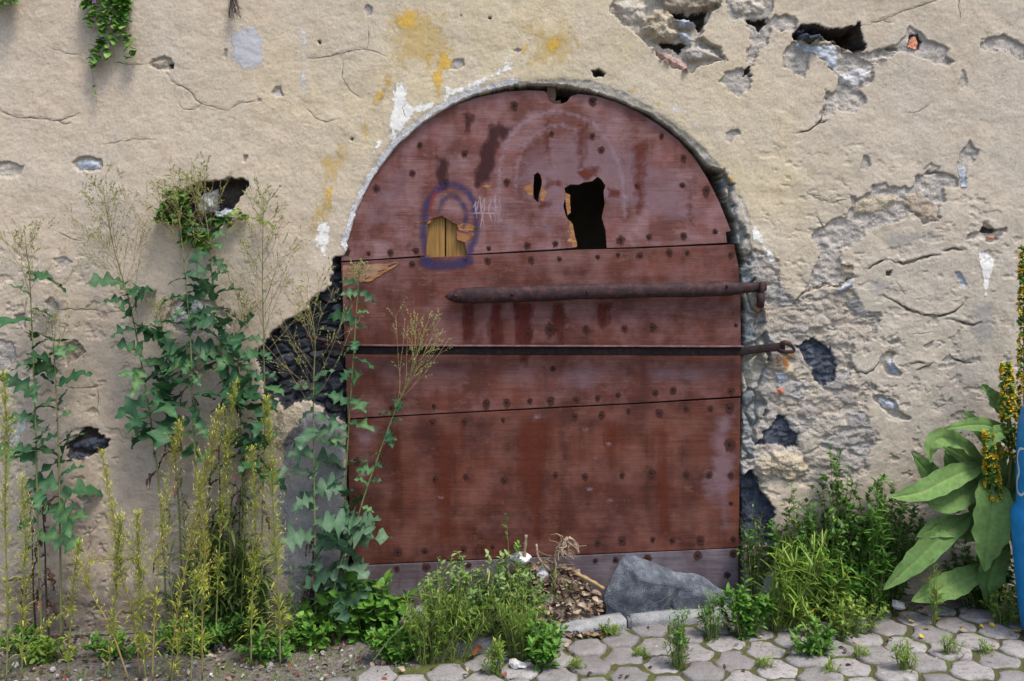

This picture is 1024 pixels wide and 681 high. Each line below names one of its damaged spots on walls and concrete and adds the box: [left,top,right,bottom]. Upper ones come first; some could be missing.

crack [117,62,253,111]
crack [310,26,383,99]
water stain [373,44,527,153]
spalling [609,0,967,117]
rust [437,159,447,189]
rust [475,125,508,187]
spalling [967,223,1006,243]
rust [514,302,532,362]
spalling [257,78,979,545]
crack [791,247,980,334]
crack [909,358,970,370]